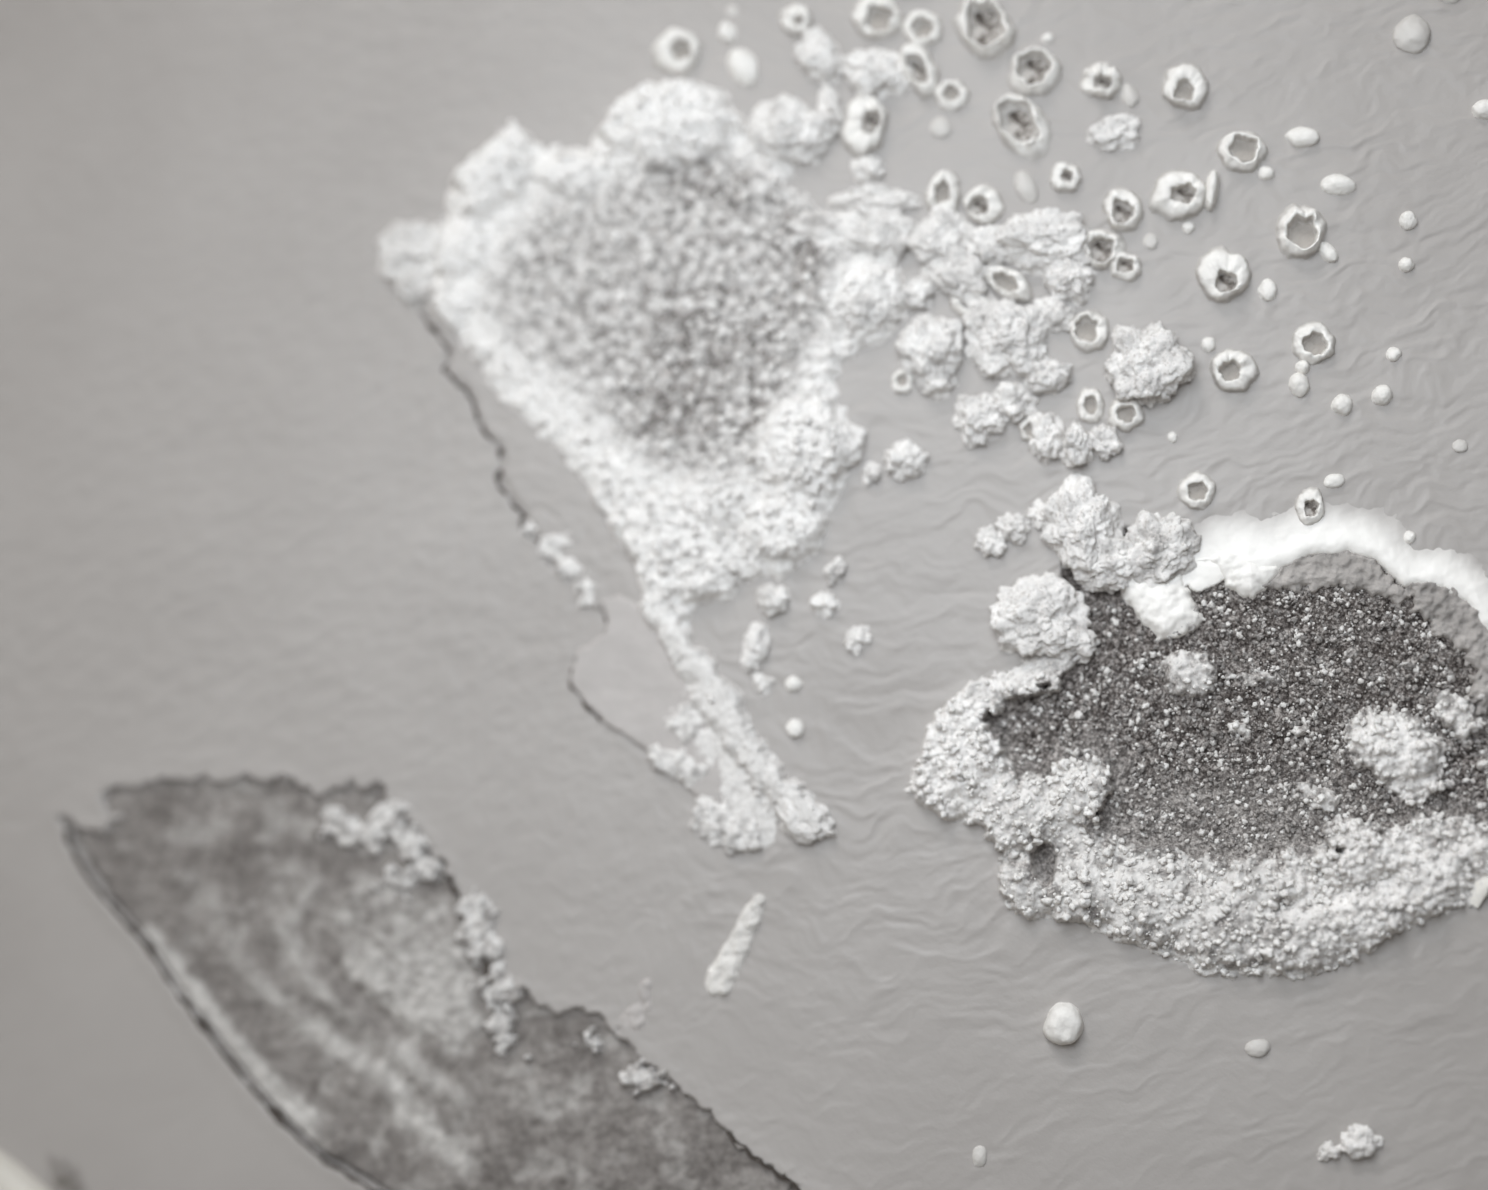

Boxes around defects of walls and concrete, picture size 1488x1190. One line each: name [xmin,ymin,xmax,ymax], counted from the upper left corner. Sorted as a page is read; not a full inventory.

crack [416,302,551,566]
efflorescence [375,78,908,855]
crack [568,655,602,724]
spalling [904,473,1488,981]
peeling [62,775,801,1190]